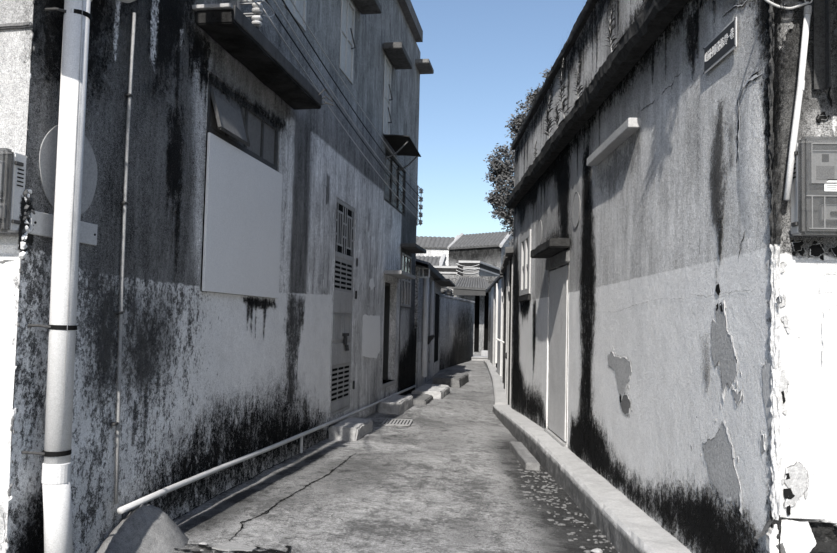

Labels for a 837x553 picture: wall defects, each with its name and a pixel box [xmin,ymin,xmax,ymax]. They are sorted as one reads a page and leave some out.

leakage [24,0,64,91]
leakage [86,0,138,100]
leakage [755,0,787,242]
leakage [18,189,35,260]
leakage [511,0,763,553]
leakage [143,294,329,518]
peeling [607,346,632,418]
peeling [700,284,746,523]
peeling [760,351,790,454]
peeling [0,483,13,550]
crack [172,453,355,553]
spalling [754,459,837,553]